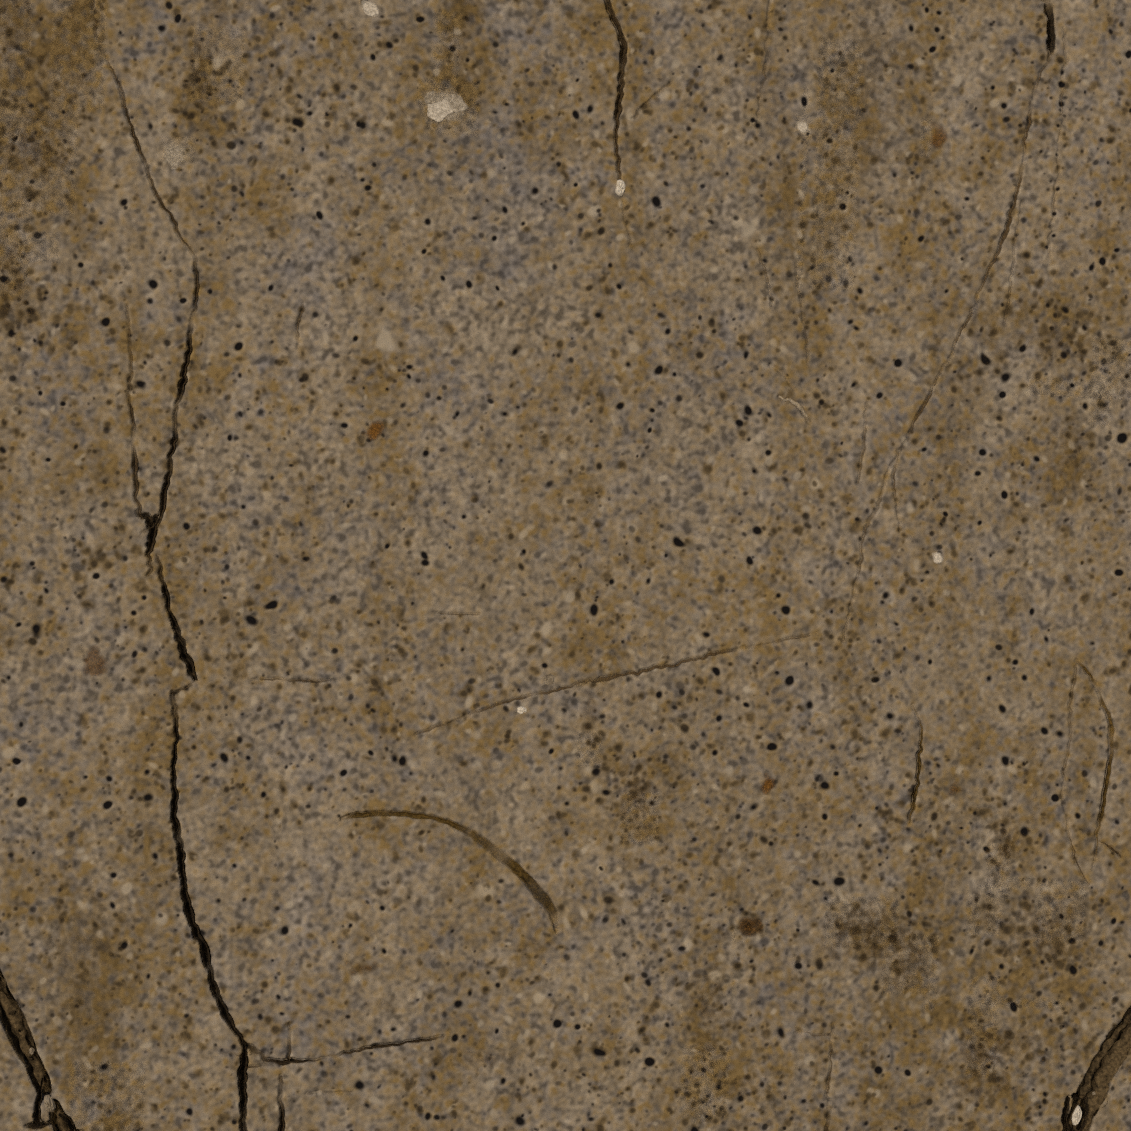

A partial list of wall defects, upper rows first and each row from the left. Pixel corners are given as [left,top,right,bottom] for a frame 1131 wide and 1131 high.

crack [606,0,627,197]
crack [1023,114,1031,147]
crack [1037,8,1055,82]
crack [955,176,1022,343]
crack [911,372,941,430]
crack [108,64,437,1131]
crack [478,651,730,714]
crack [0,969,78,1131]
crack [1062,1008,1131,1131]